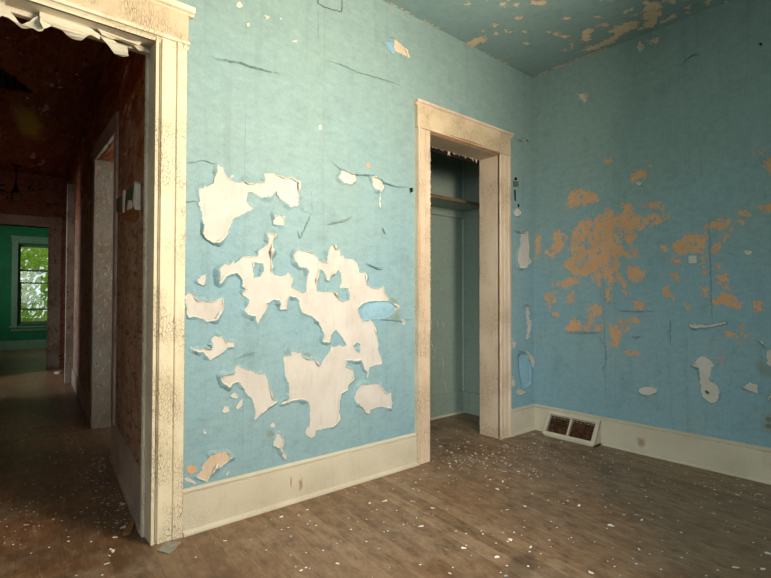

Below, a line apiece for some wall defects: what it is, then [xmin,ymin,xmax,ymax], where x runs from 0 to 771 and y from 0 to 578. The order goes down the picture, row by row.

peeling [0,1,151,83]
peeling [383,37,411,60]
peeling [466,23,512,65]
peeling [538,0,693,75]
peeling [566,188,599,211]
peeling [185,161,405,440]
peeling [515,200,670,359]
peeling [660,203,771,310]
peeling [511,306,535,397]
peeling [690,354,726,404]
peeling [185,448,236,484]
peeling [271,423,289,462]